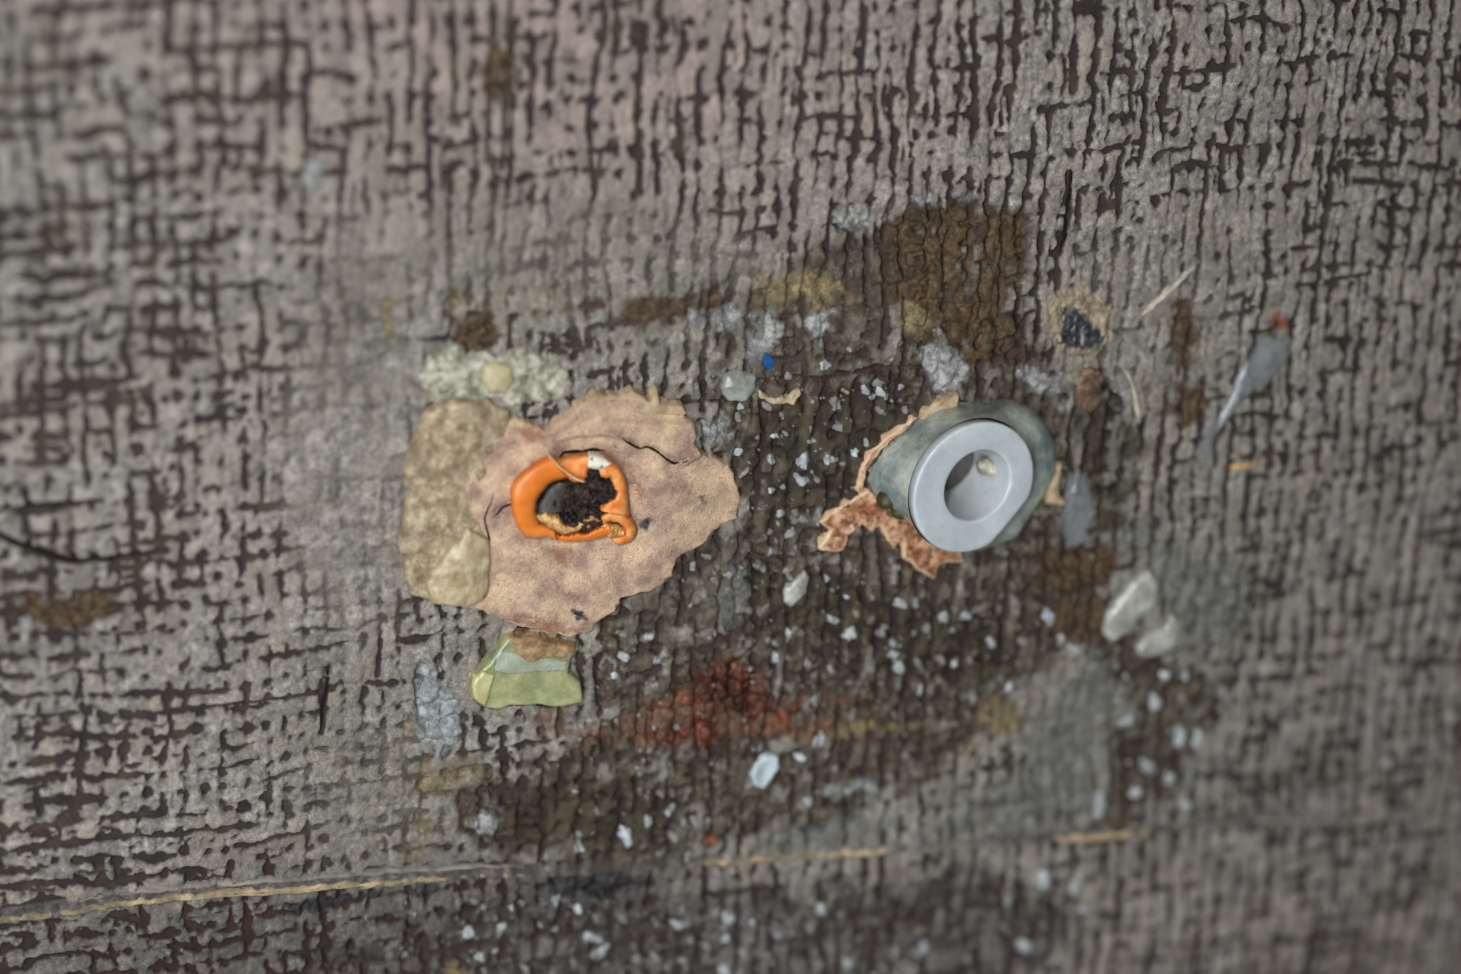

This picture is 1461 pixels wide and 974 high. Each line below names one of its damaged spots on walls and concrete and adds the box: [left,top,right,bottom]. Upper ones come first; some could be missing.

water stain [300,158,324,194]
crack [0,498,166,563]
peeling [817,415,964,579]
water stain [286,189,1216,974]
rust [617,659,833,749]